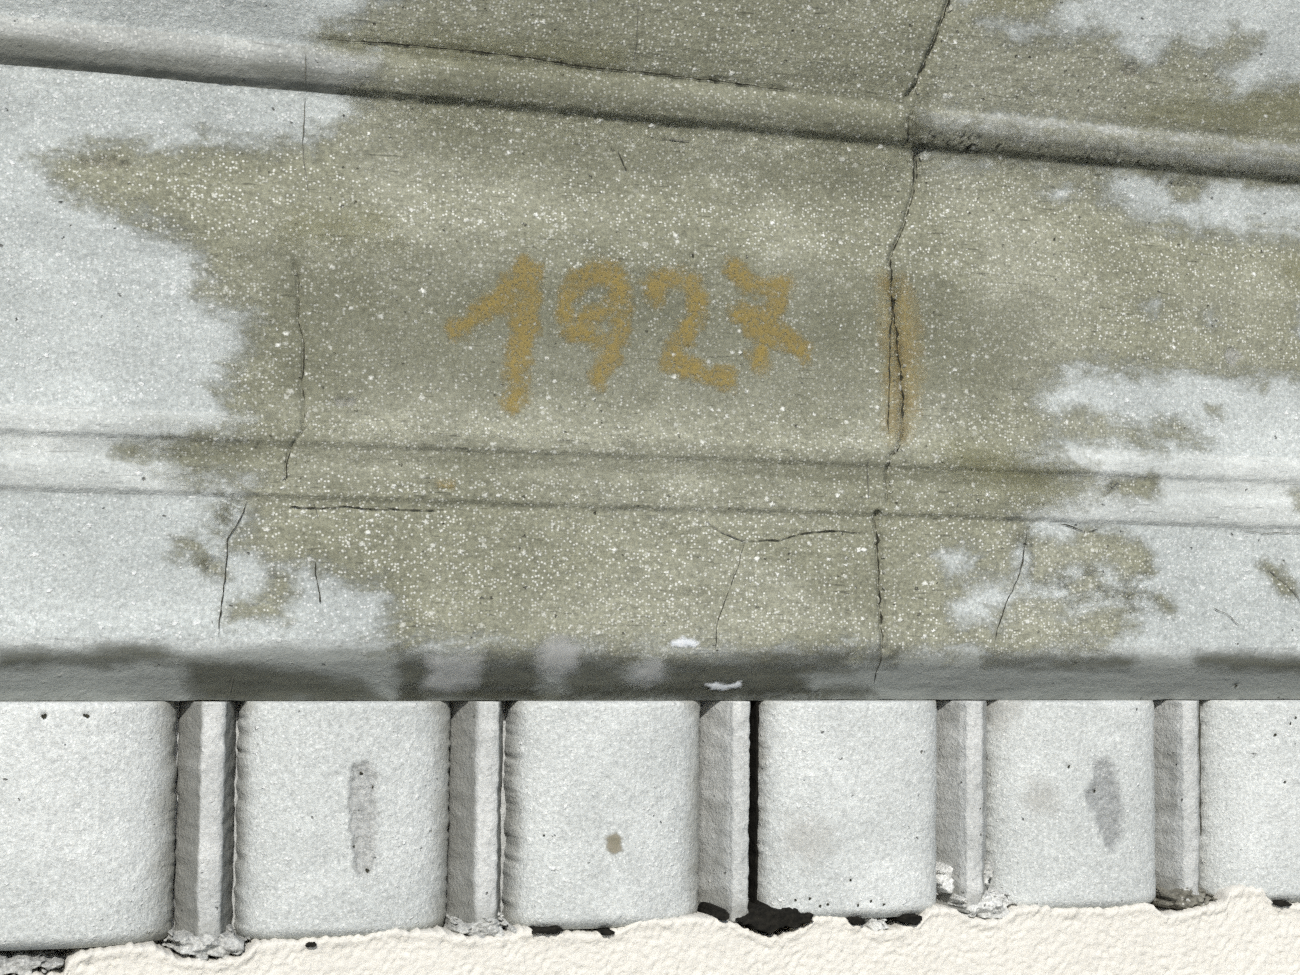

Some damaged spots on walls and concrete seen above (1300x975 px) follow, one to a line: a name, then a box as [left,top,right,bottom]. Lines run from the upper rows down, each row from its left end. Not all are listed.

crack [281,273,443,516]
water stain [39,0,1300,681]
crack [707,0,953,682]
crack [218,502,247,636]
water stain [432,663,474,689]